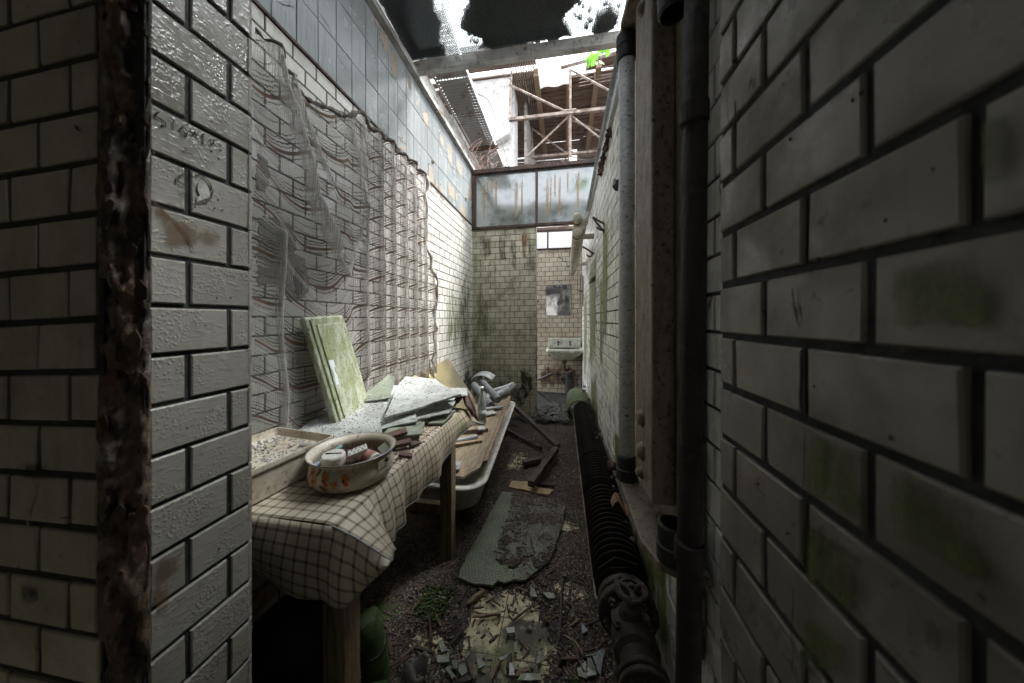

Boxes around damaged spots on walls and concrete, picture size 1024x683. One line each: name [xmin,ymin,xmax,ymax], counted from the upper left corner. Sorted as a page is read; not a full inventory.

rust [479,127,612,219]
water stain [482,238,516,268]